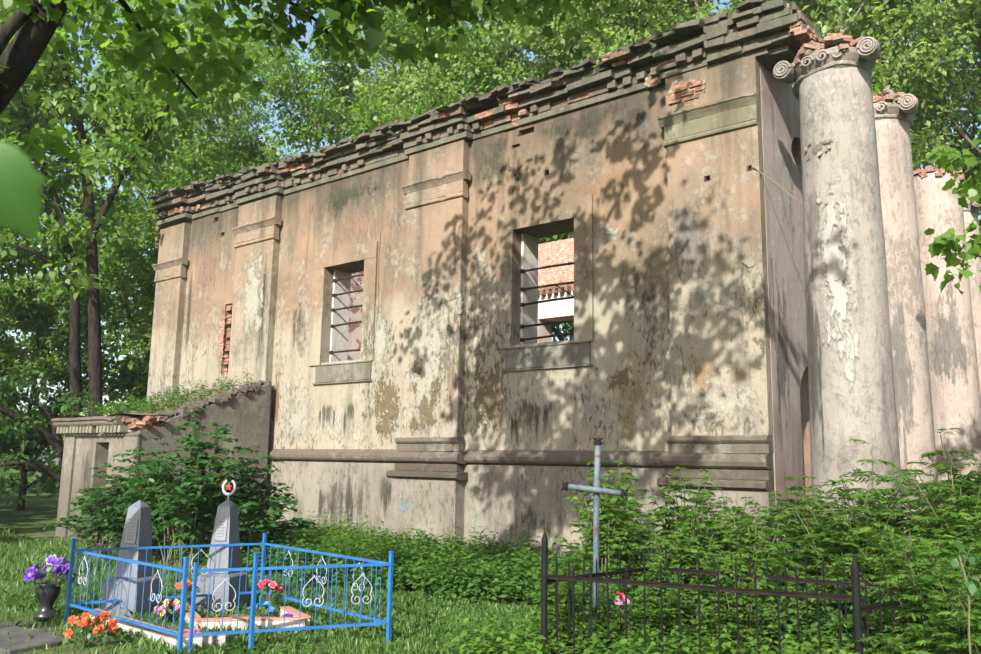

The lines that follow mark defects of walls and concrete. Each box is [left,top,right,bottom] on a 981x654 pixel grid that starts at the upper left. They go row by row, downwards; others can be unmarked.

spalling [644,74,706,109]
spalling [216,309,225,373]
peeling [373,282,463,448]
water stain [511,400,552,440]
water stain [319,477,362,521]
water stain [380,478,392,507]